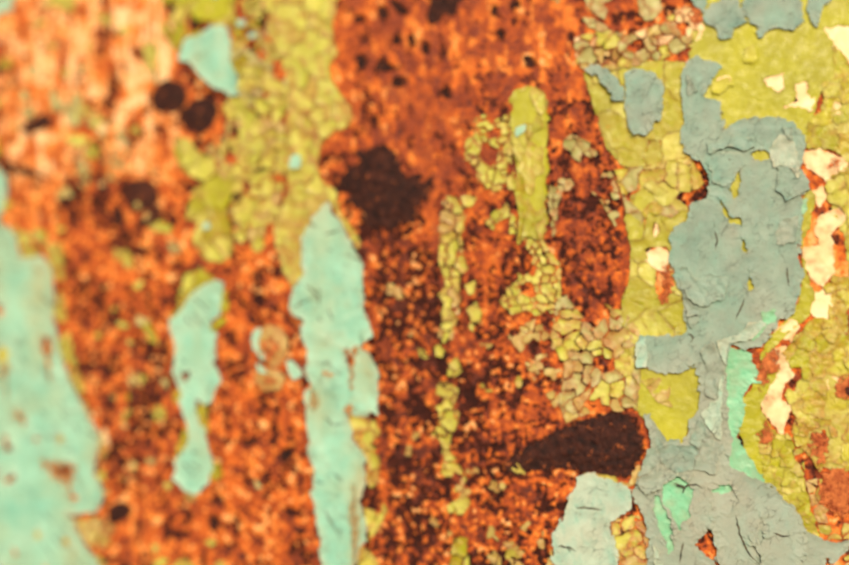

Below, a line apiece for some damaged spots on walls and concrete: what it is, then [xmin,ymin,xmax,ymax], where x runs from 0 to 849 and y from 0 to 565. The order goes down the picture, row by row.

spalling [356,54,407,88]
rust [151,79,218,136]
peeling [49,88,141,200]
rust [112,179,162,228]
rust [338,142,434,231]
peeling [127,0,388,565]
peeling [464,0,849,565]
peeling [0,170,116,565]
rust [251,325,303,391]
rust [502,410,645,479]
rust [108,502,132,524]
crack [736,517,760,565]